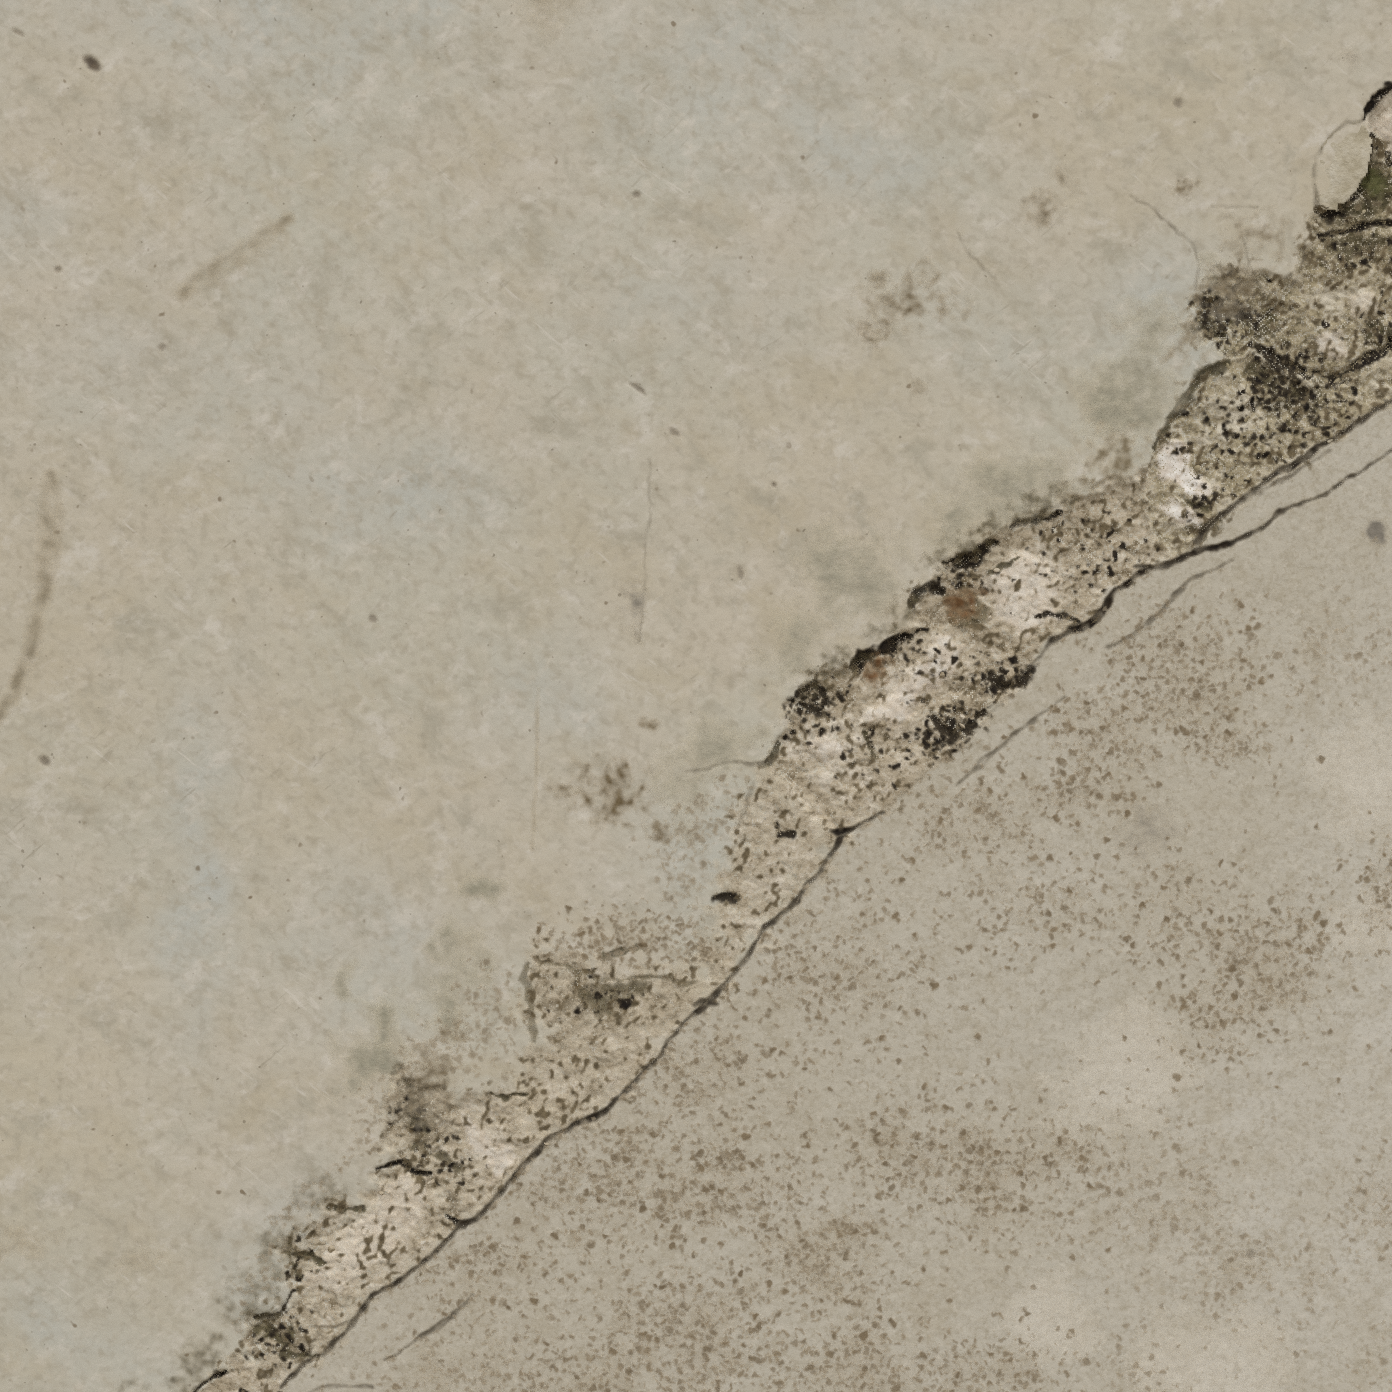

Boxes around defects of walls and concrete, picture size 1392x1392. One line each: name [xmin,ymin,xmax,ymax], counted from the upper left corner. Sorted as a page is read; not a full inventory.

spalling [694,81,1392,991]
crack [1047,400,1392,646]
spalling [194,952,700,1392]
crack [280,812,885,1388]
spalling [602,945,643,960]